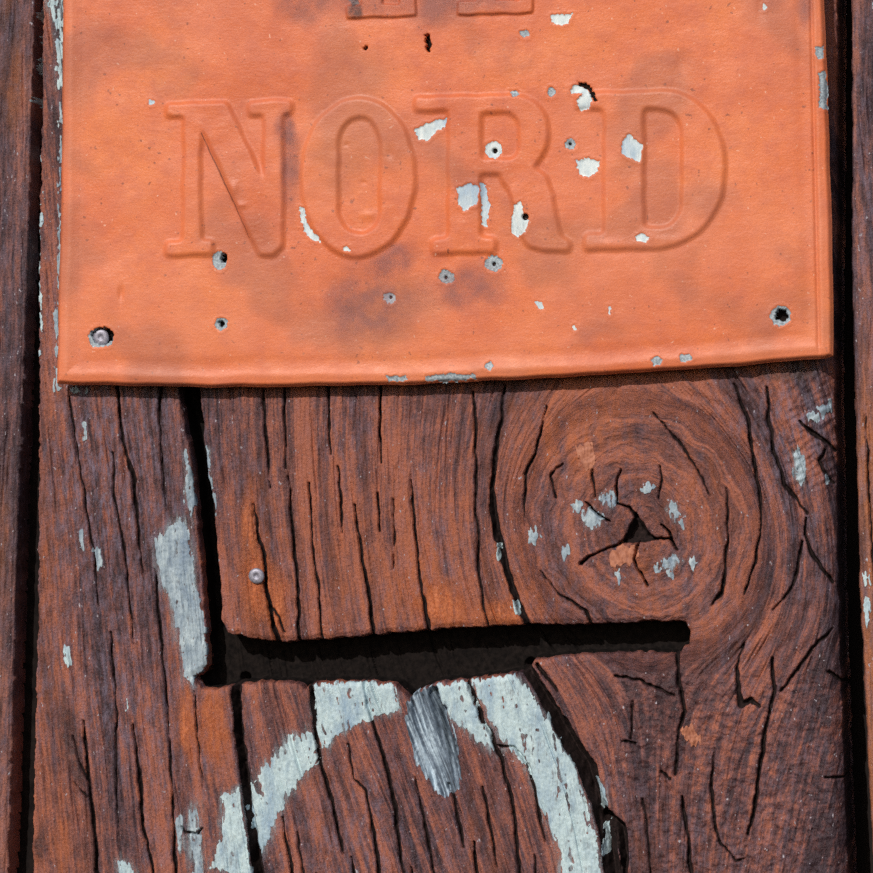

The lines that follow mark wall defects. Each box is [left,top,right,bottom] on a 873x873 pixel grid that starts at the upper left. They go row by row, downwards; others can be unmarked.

peeling [414,118,447,141]
peeling [456,183,491,227]
peeling [511,201,529,237]
peeling [570,85,592,111]
peeling [621,134,643,162]
crack [111,385,203,873]
peeling [154,449,209,686]
crack [254,387,332,641]
crack [328,385,439,637]
crack [472,385,538,628]
crack [653,384,837,609]
crack [735,628,833,836]